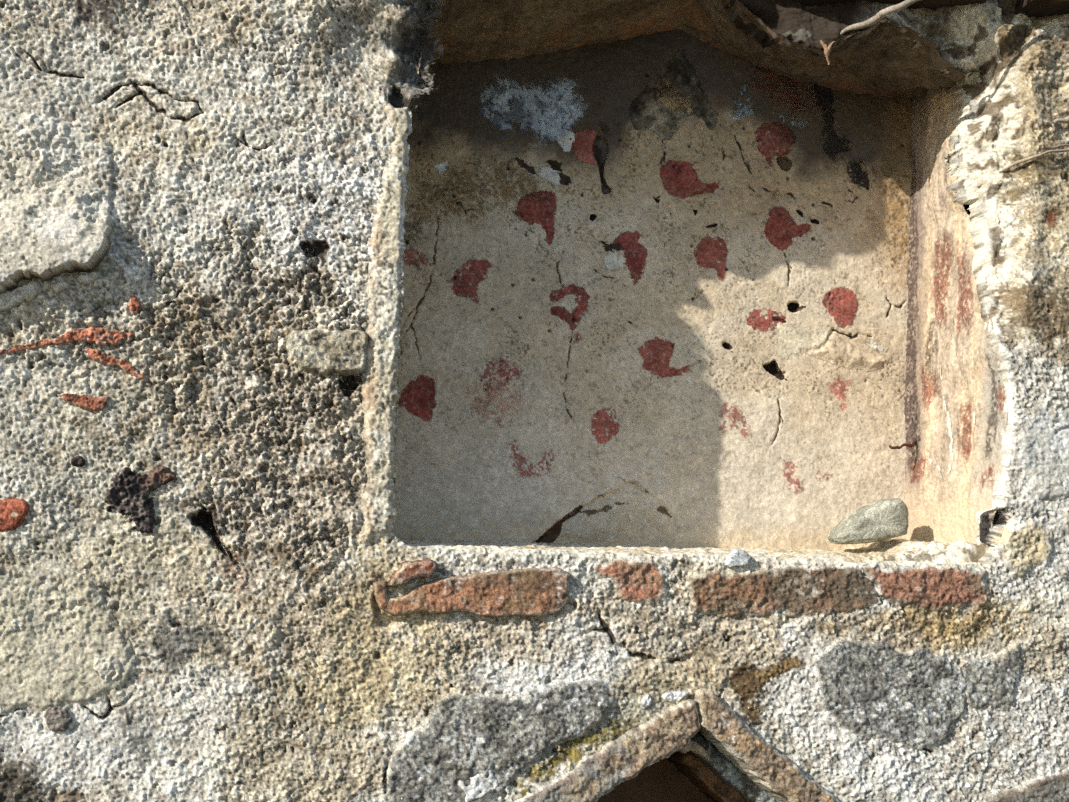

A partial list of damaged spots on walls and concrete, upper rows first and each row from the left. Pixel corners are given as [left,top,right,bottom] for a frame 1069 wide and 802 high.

crack [16,53,85,79]
crack [103,82,203,122]
flaking render [629,50,718,140]
flaking render [515,129,575,186]
flaking render [592,120,611,194]
spalling [776,156,792,171]
crack [592,613,691,663]